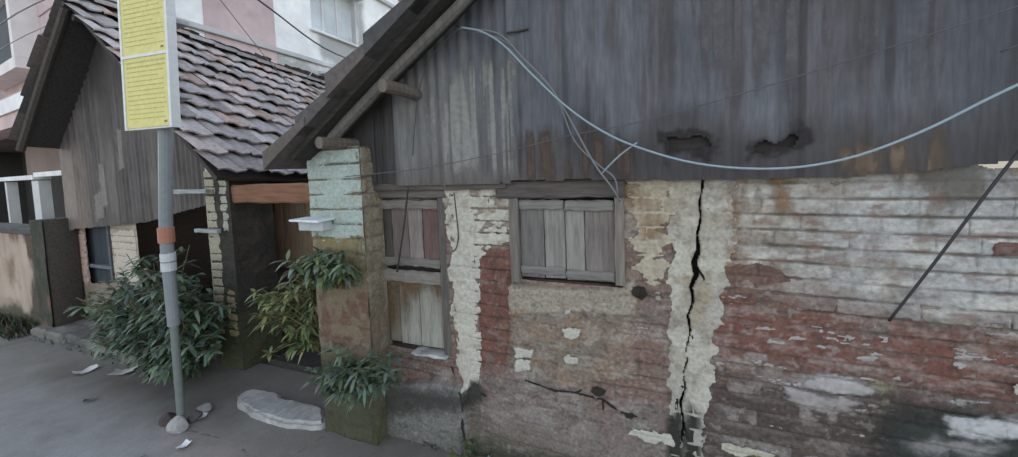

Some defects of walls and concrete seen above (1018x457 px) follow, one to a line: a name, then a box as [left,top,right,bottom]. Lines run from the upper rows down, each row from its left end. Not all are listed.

peeling [444,189,511,394]
crack [675,180,705,430]
peeling [627,164,1018,457]
damp [385,382,484,414]
crack [525,379,645,419]
damp [783,374,876,413]
damp [721,443,775,457]
damp [872,408,1018,457]